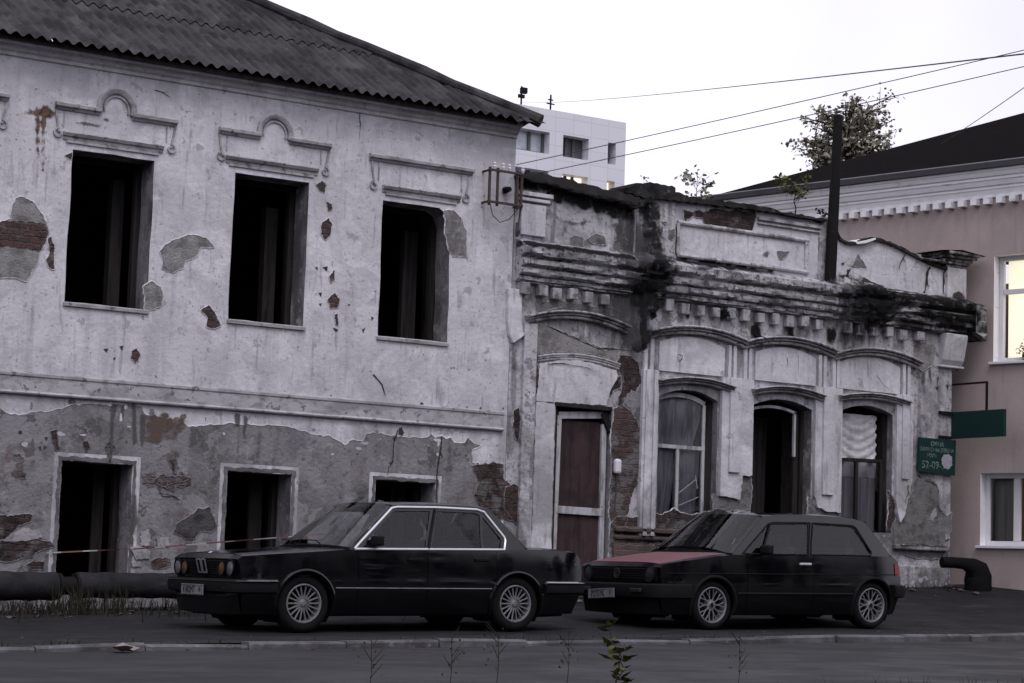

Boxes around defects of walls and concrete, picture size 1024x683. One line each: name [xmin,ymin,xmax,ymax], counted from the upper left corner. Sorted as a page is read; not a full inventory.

rust [28,105,55,171]
flaking render [0,195,56,283]
flaking render [159,233,214,274]
flaking render [199,305,222,330]
flaking render [316,180,333,241]
damp [516,179,774,352]
damp [821,274,983,344]
crack [899,254,953,300]
peeling [0,399,520,573]
crack [435,436,443,503]
flaking render [535,324,753,546]
flaking render [886,473,953,566]